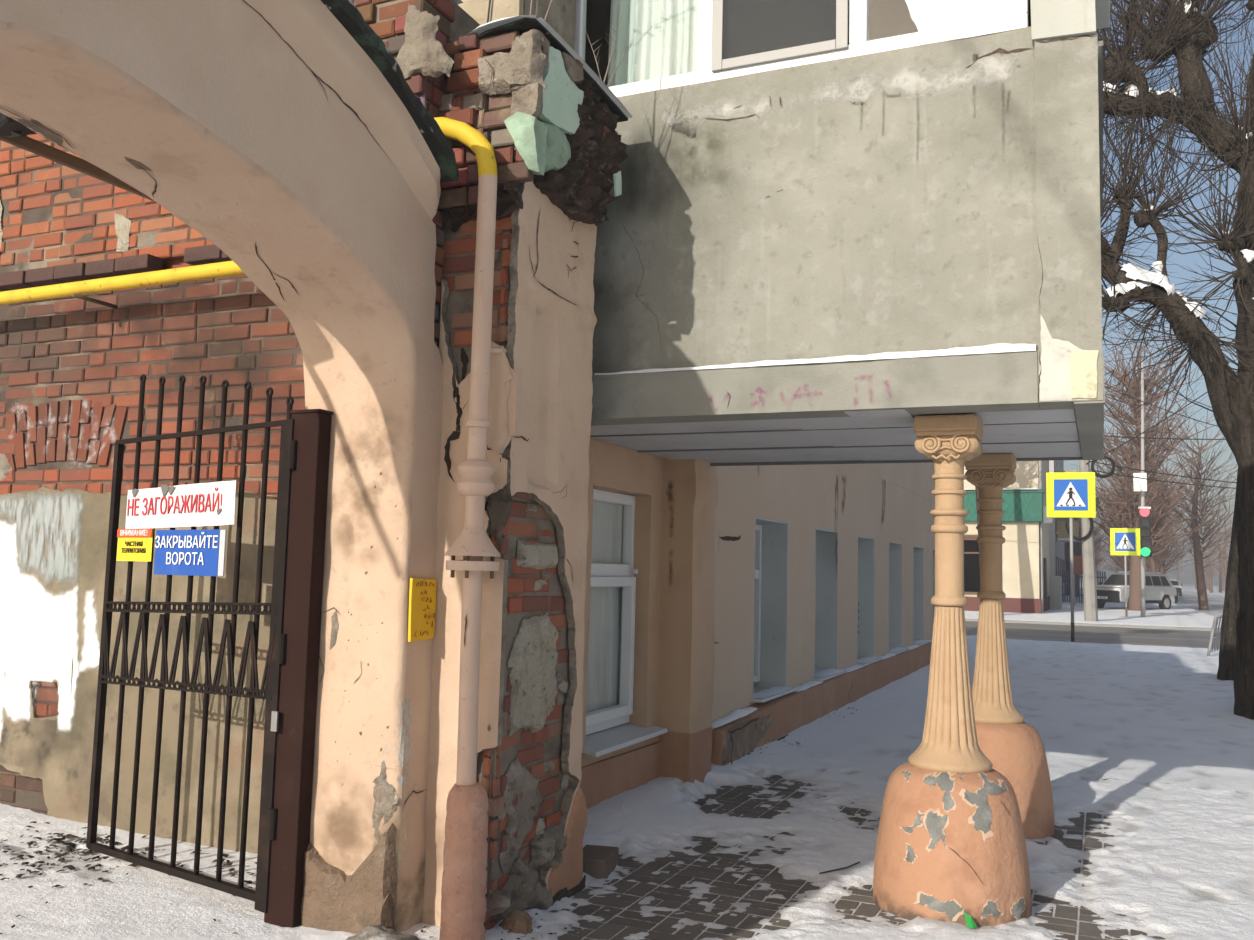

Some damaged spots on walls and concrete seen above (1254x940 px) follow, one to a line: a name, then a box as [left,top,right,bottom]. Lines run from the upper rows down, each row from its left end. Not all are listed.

crack [243,0,393,164]
peeling [504,32,584,176]
efflorescence [666,98,769,124]
efflorescence [811,53,1017,102]
peeling [613,171,622,196]
crack [529,201,662,353]
spalling [1039,316,1099,401]
crack [444,348,469,483]
spalling [301,726,399,934]
spalling [486,818,567,918]
peeling [913,891,964,921]
peeling [899,770,1009,865]